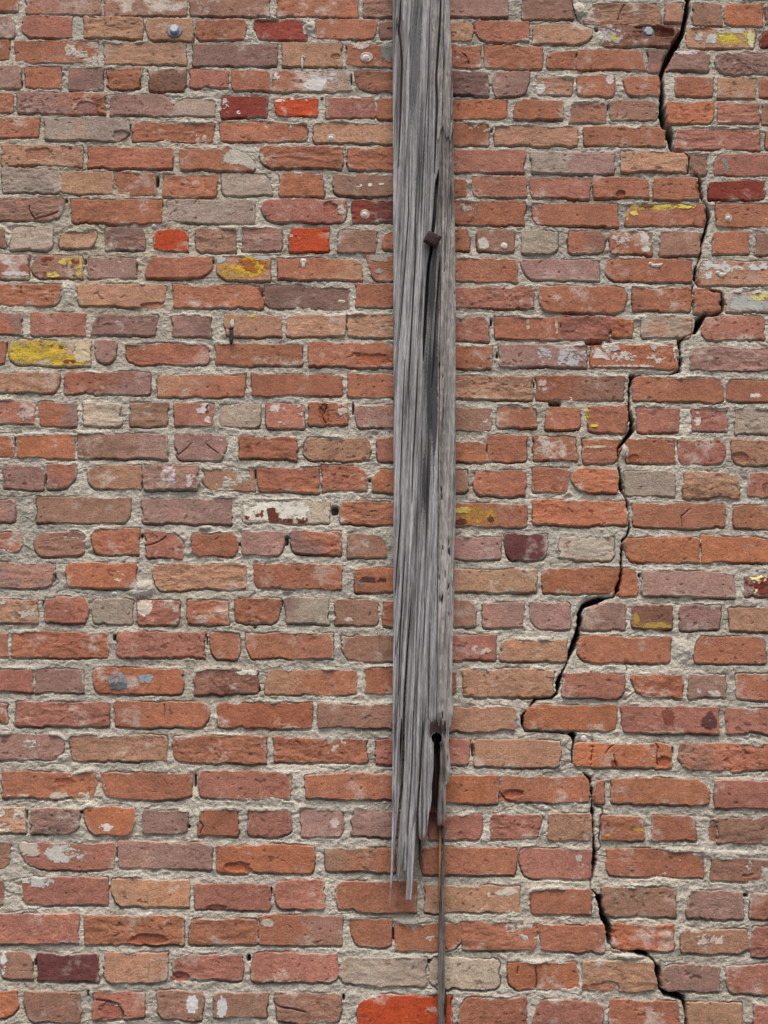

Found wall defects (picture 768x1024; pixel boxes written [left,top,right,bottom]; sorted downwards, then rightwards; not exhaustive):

crack [658,0,723,375]
crack [520,377,634,731]
crack [567,732,687,1020]